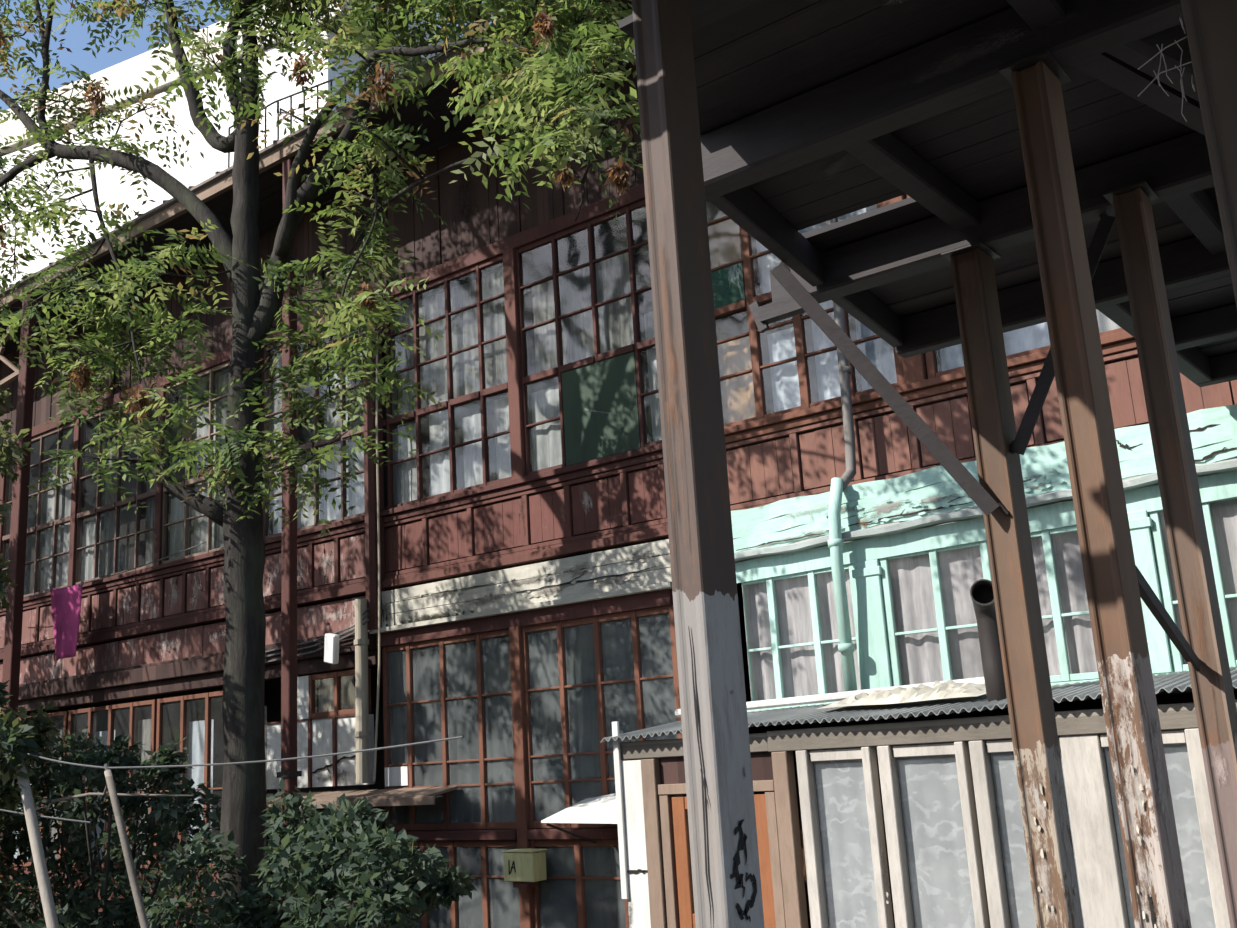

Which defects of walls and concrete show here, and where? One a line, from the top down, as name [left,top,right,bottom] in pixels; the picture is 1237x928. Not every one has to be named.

crack [1116,440,1142,450]
crack [1189,424,1237,462]
peeling [1024,469,1064,492]
peeling [761,492,968,546]
peeling [419,551,658,608]
peeling [1125,765,1145,810]
peeling [1031,781,1077,916]
peeling [1136,825,1191,928]